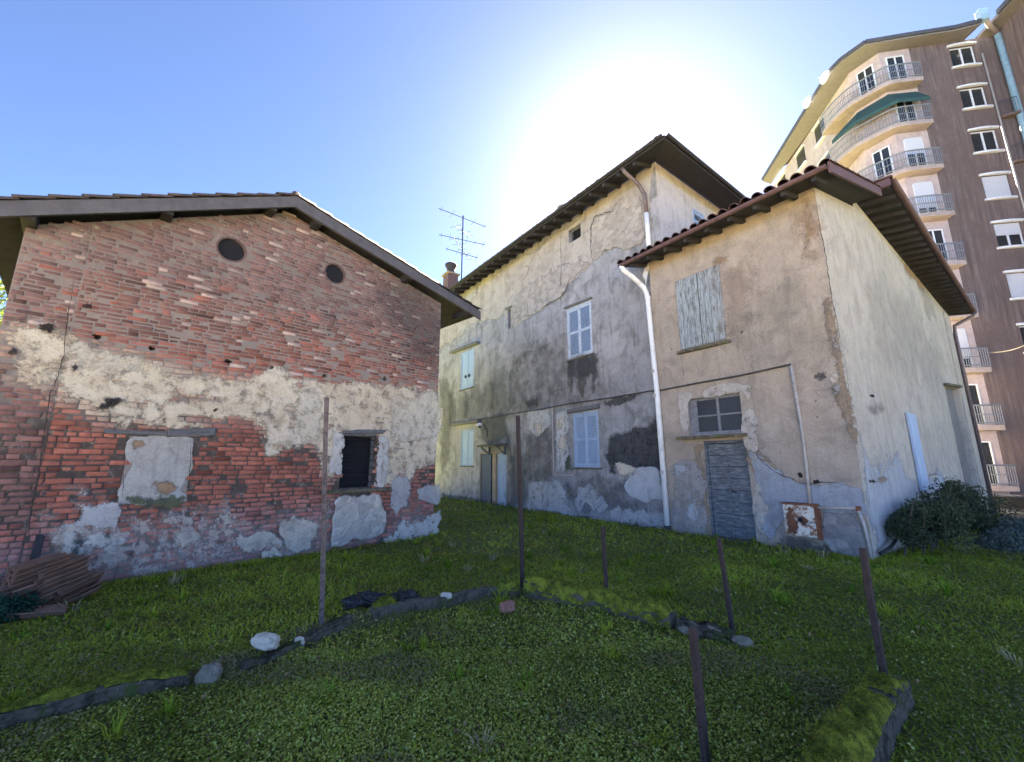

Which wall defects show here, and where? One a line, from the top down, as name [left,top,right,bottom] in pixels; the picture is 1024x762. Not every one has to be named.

crack [516,204,616,312]
leakage [513,346,597,408]
crack [25,275,74,561]
peeling [6,323,442,543]
peeling [527,406,569,472]
peeling [52,523,127,559]
peeling [173,527,205,549]
peeling [234,515,319,559]